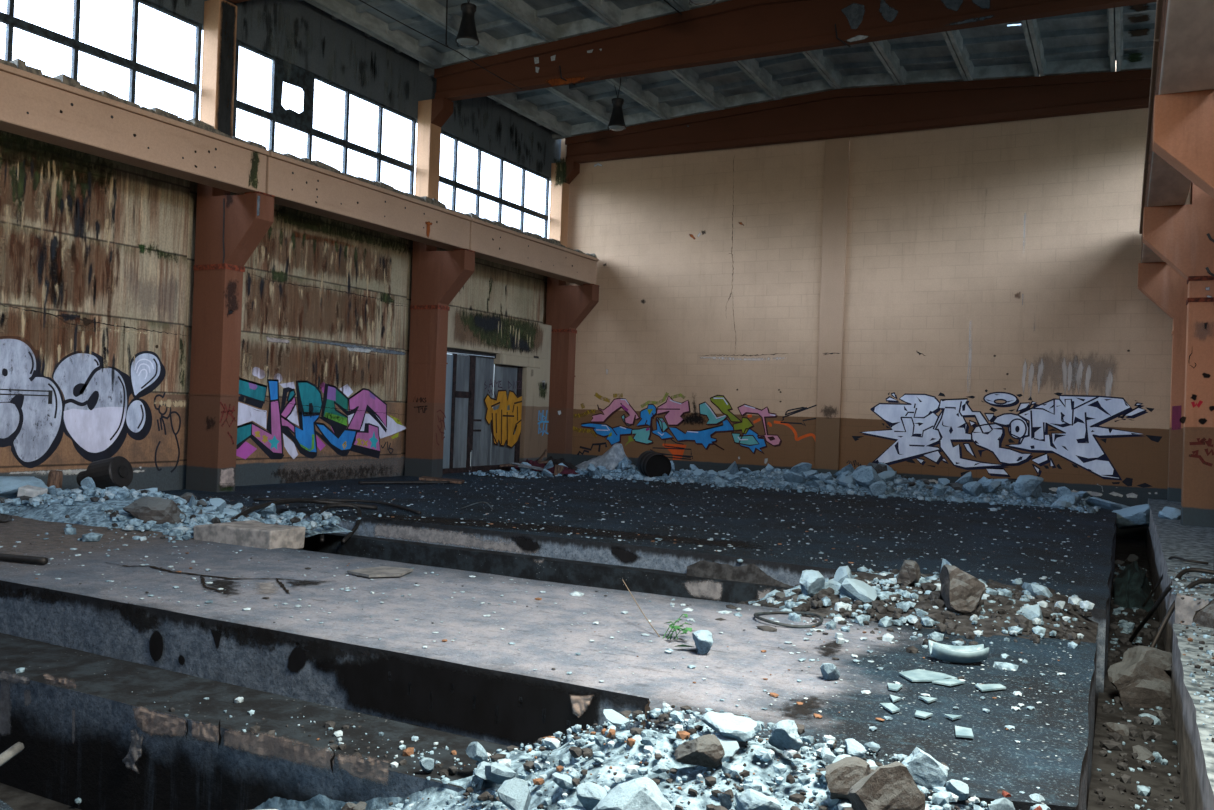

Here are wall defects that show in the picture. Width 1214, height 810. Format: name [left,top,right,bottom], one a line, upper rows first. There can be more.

peeling [841,0,898,42]
leakage [0,150,135,392]
leakage [239,230,395,399]
crack [698,156,788,357]
leakage [1062,357,1091,395]